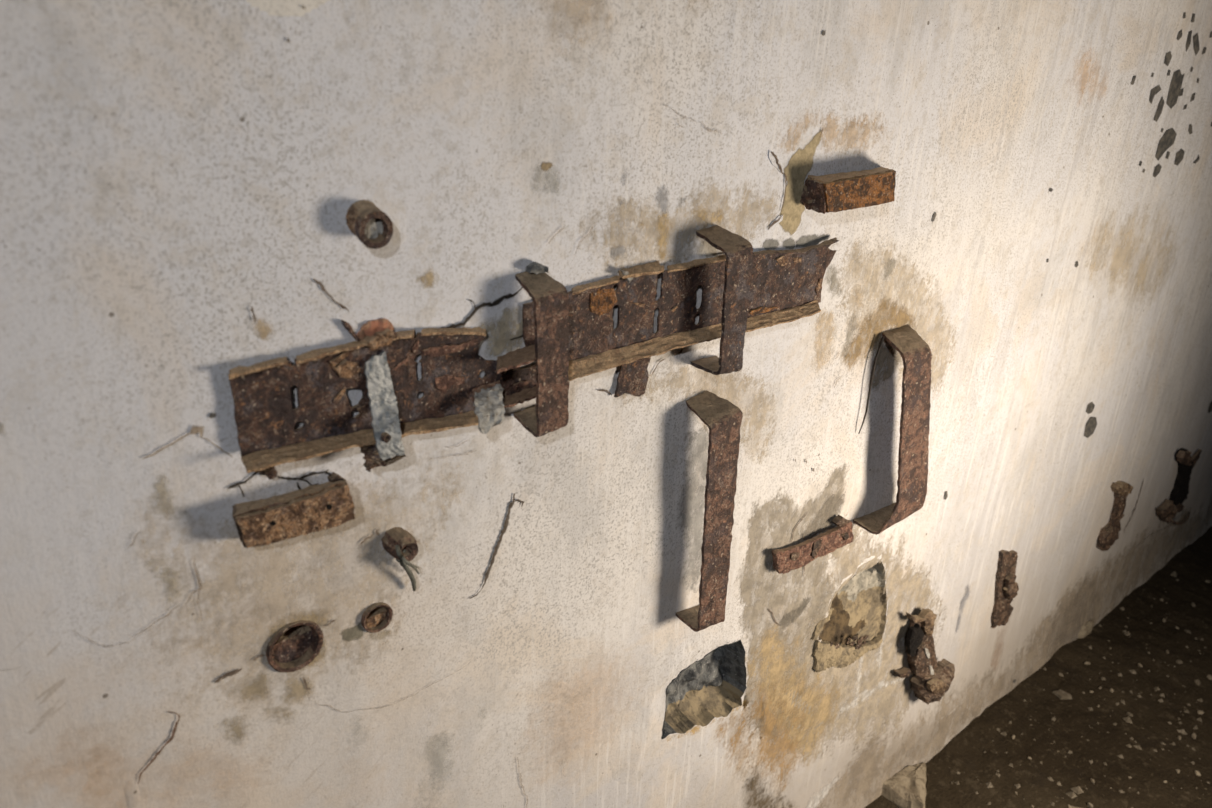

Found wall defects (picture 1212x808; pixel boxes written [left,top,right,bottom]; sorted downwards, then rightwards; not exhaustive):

crack [135,558,202,635]
crack [469,494,524,599]
flaking render [662,466,887,739]
damp [720,599,898,781]
damp [806,502,1212,808]
corrosion [1003,573,1019,599]